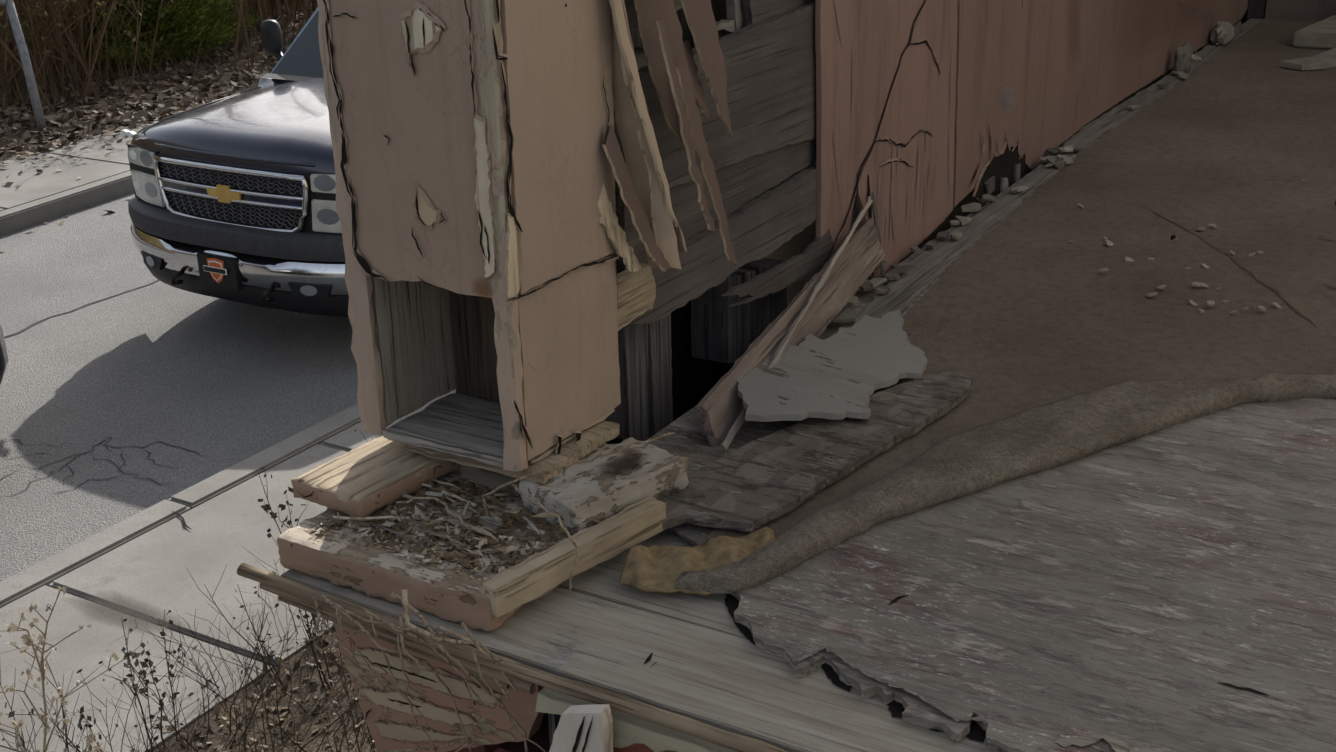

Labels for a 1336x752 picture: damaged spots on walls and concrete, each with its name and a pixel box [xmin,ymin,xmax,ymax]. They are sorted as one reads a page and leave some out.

peeling [399,1,446,76]
peeling [412,179,441,258]
peeling [472,115,523,300]
crack [827,0,941,261]
peeling [925,138,1028,249]
peeling [1040,145,1083,169]
crack [505,255,619,306]
hole [671,300,734,421]